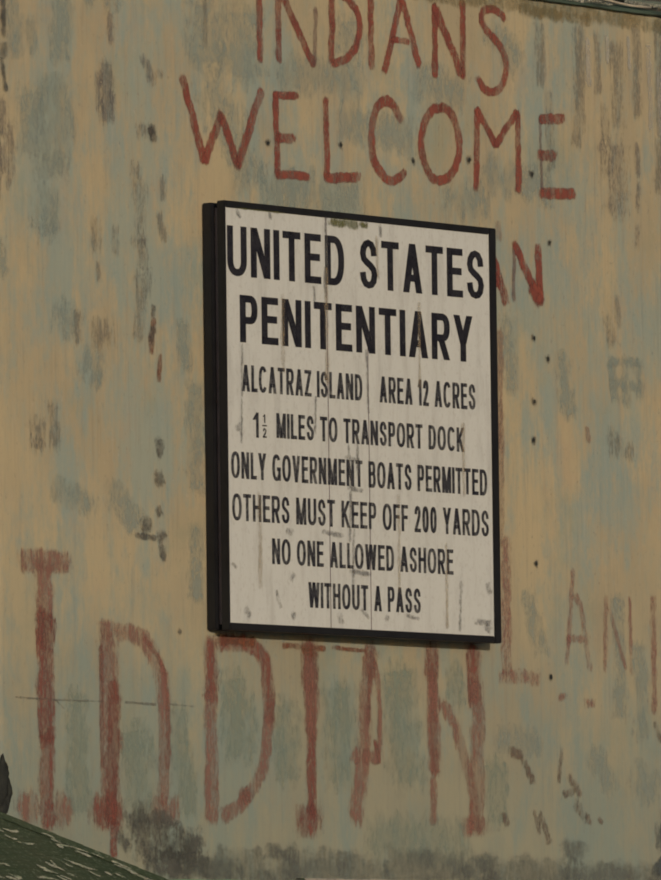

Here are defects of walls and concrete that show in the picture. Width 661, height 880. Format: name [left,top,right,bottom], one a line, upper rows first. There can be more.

leakage [118,809,364,880]